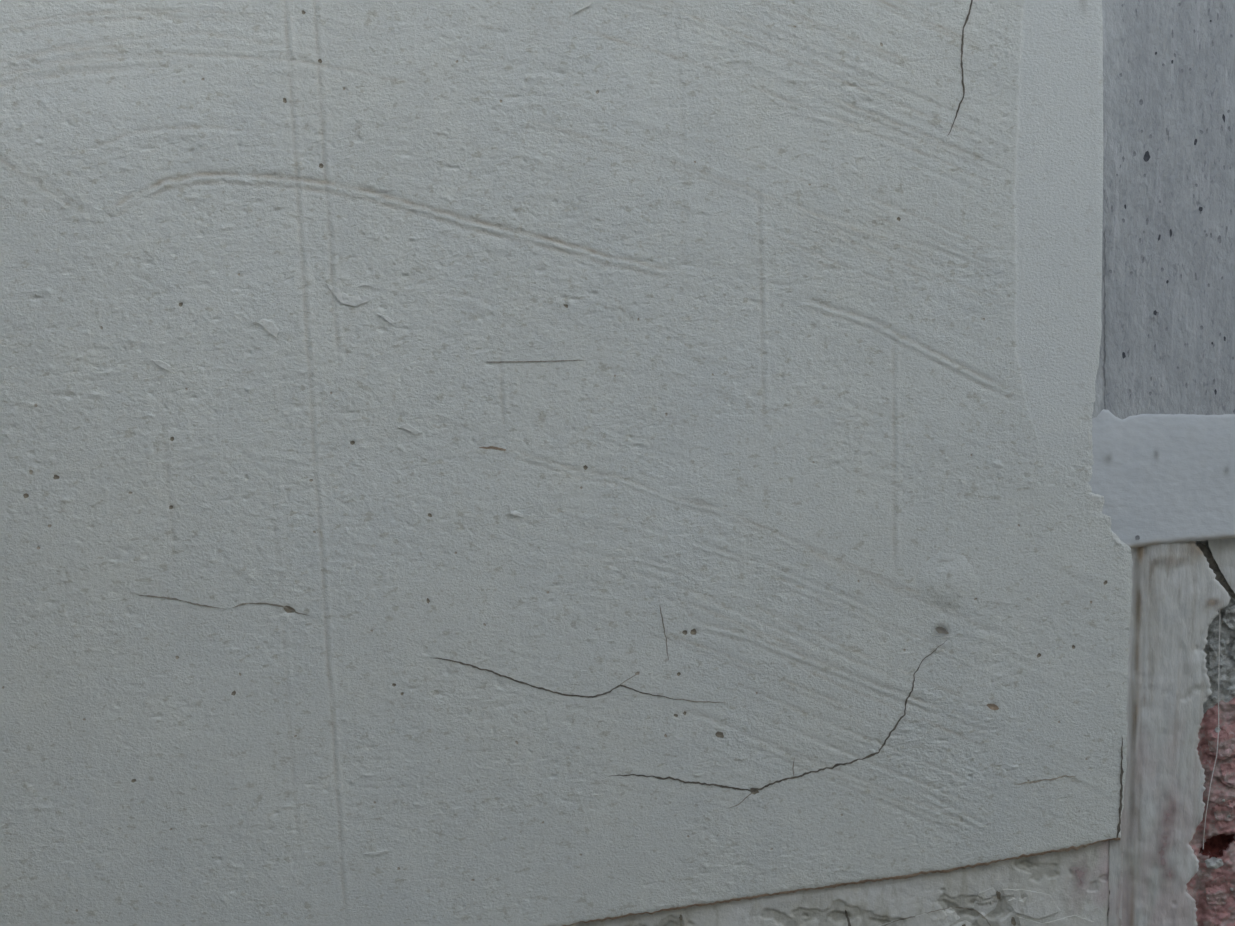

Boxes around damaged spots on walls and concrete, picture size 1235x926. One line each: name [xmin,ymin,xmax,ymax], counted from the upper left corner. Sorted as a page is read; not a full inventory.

crack [948,0,973,135]
peeling [1208,538,1235,593]
crack [139,595,310,616]
crack [660,607,669,660]
crack [436,658,725,703]
crack [611,640,947,809]
peeling [1207,724,1235,786]
peeling [1199,800,1235,905]